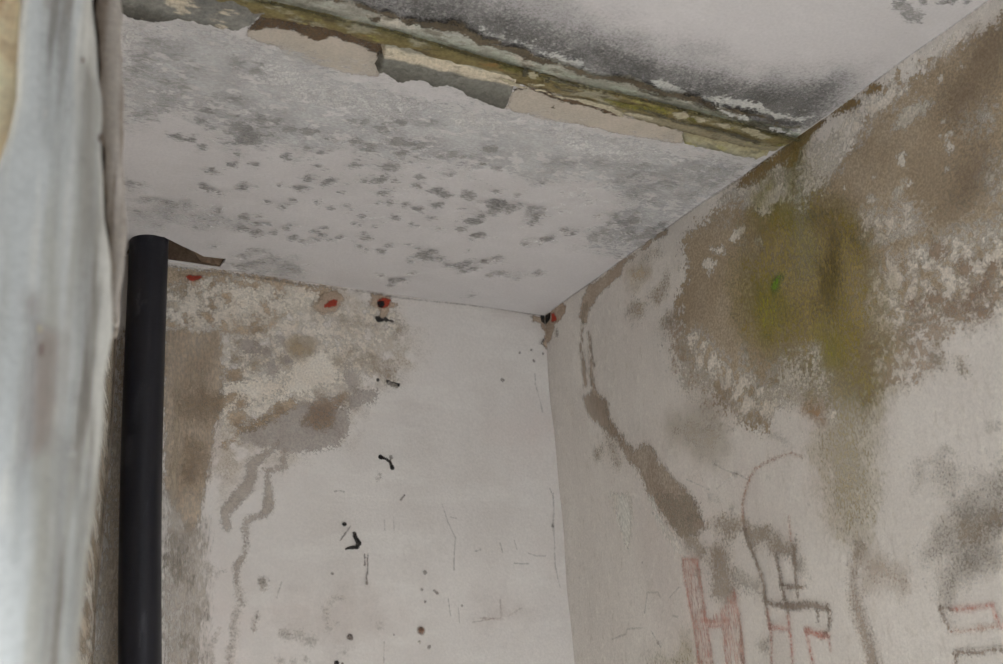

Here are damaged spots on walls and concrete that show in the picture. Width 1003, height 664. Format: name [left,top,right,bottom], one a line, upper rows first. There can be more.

spalling [247,17,383,77]
spalling [326,0,782,146]
water stain [122,28,802,606]
water stain [162,328,397,664]